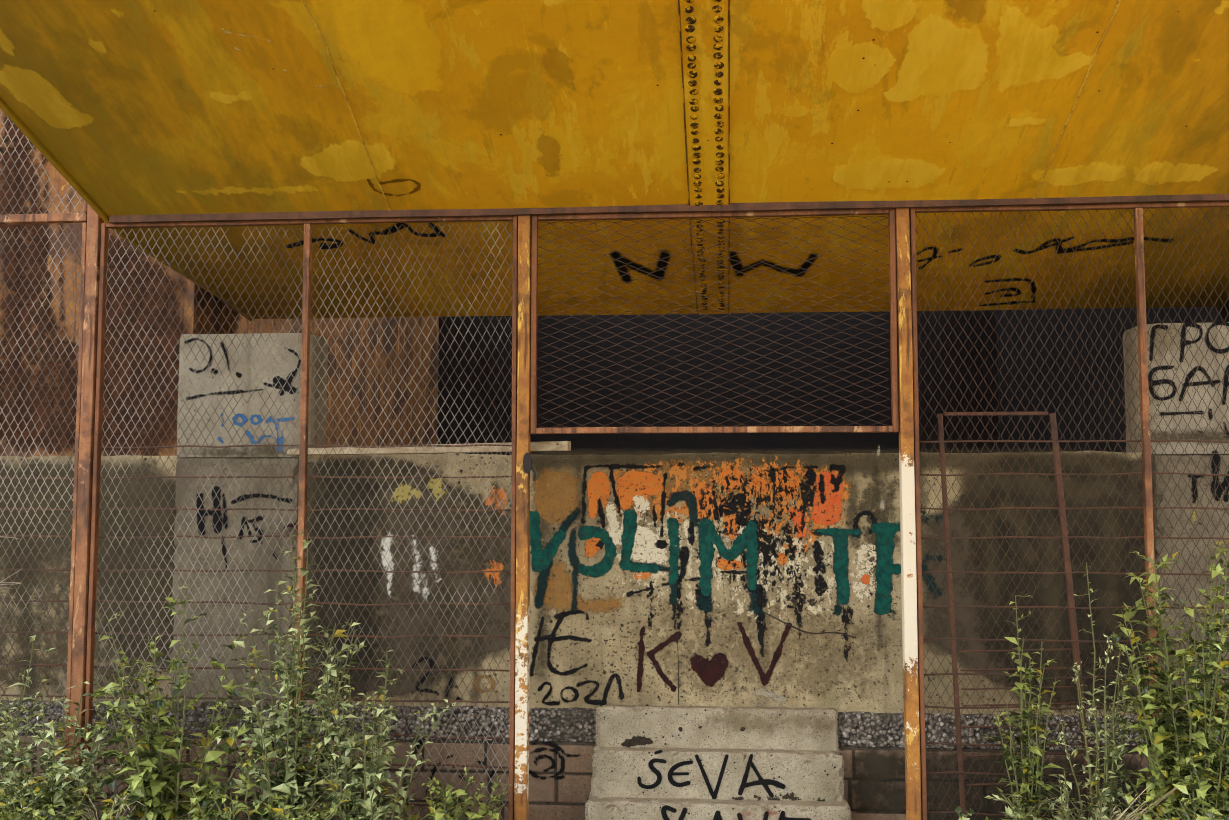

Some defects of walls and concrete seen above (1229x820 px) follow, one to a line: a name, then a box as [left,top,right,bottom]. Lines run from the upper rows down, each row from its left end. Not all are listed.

corrosion [0,116,78,454]
peeling [531,455,901,706]